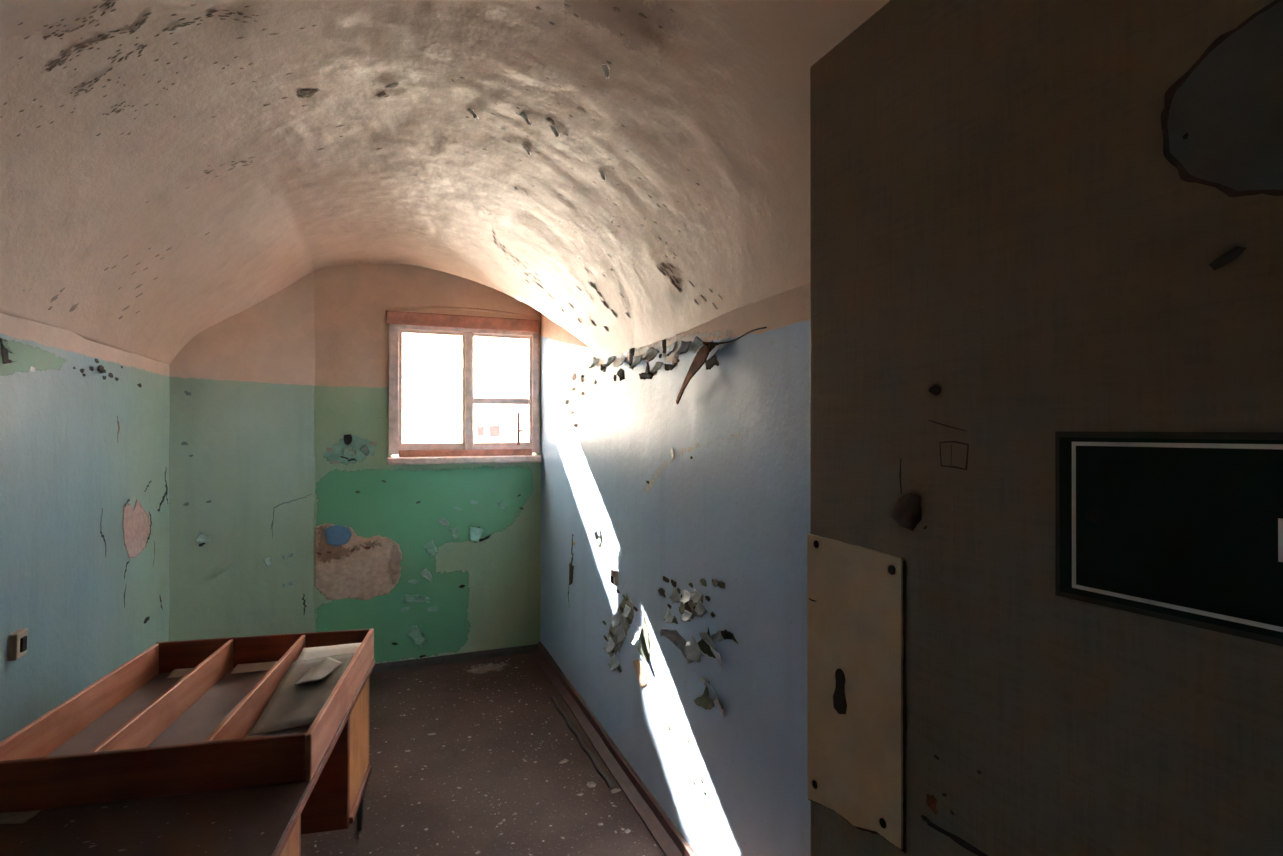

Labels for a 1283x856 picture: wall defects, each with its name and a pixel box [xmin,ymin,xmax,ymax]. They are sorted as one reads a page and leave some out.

peeling [554,327,733,455]
peeling [323,434,377,465]
spalling [122,498,155,608]
spalling [314,523,438,658]
peeling [602,589,647,688]
peeling [658,576,725,669]